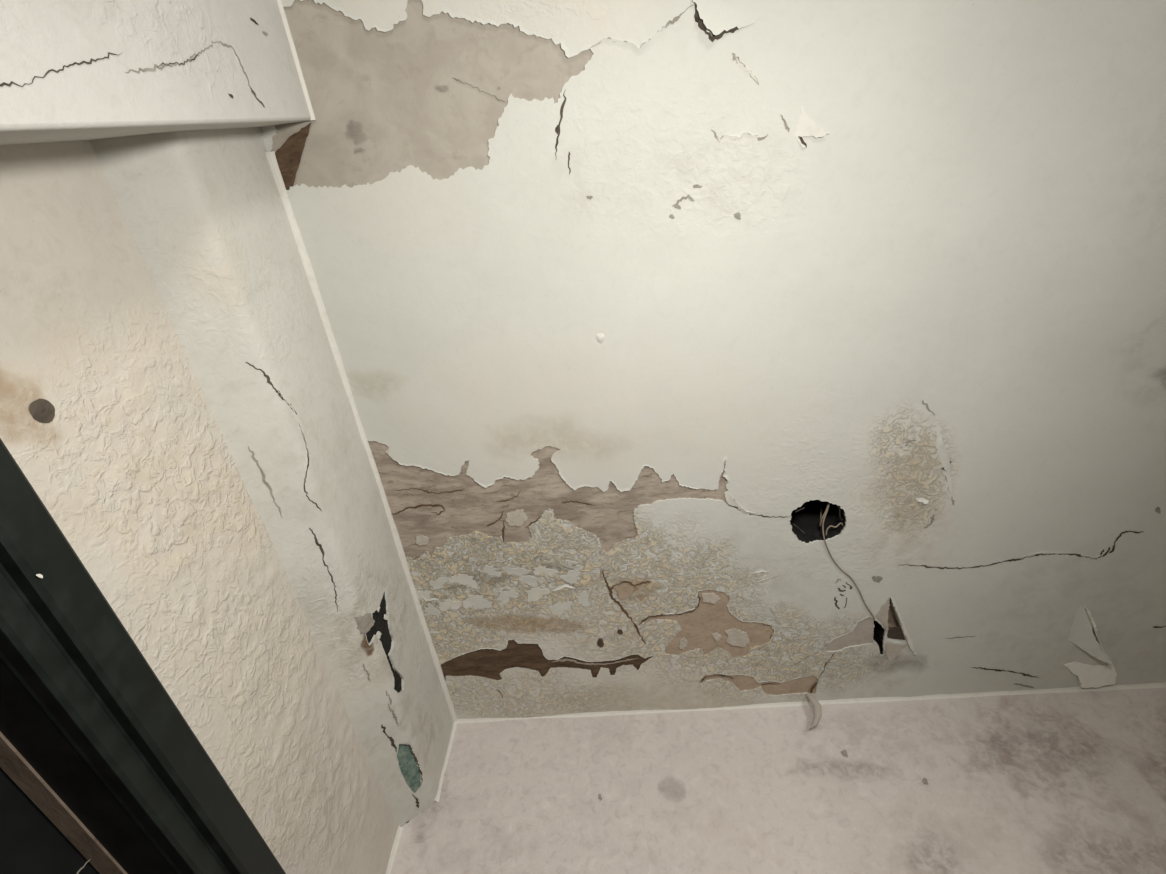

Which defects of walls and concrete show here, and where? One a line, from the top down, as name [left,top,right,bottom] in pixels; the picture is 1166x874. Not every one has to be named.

peeling [693,0,763,42]
crack [0,41,265,107]
peeling [271,0,594,188]
peeling [710,128,769,144]
crack [246,362,338,610]
spalling [368,441,730,560]
crack [906,507,1161,569]
peeling [416,556,590,616]
peeling [640,570,780,657]
spalling [441,638,650,698]
peeling [699,616,875,729]
peeling [381,725,423,808]